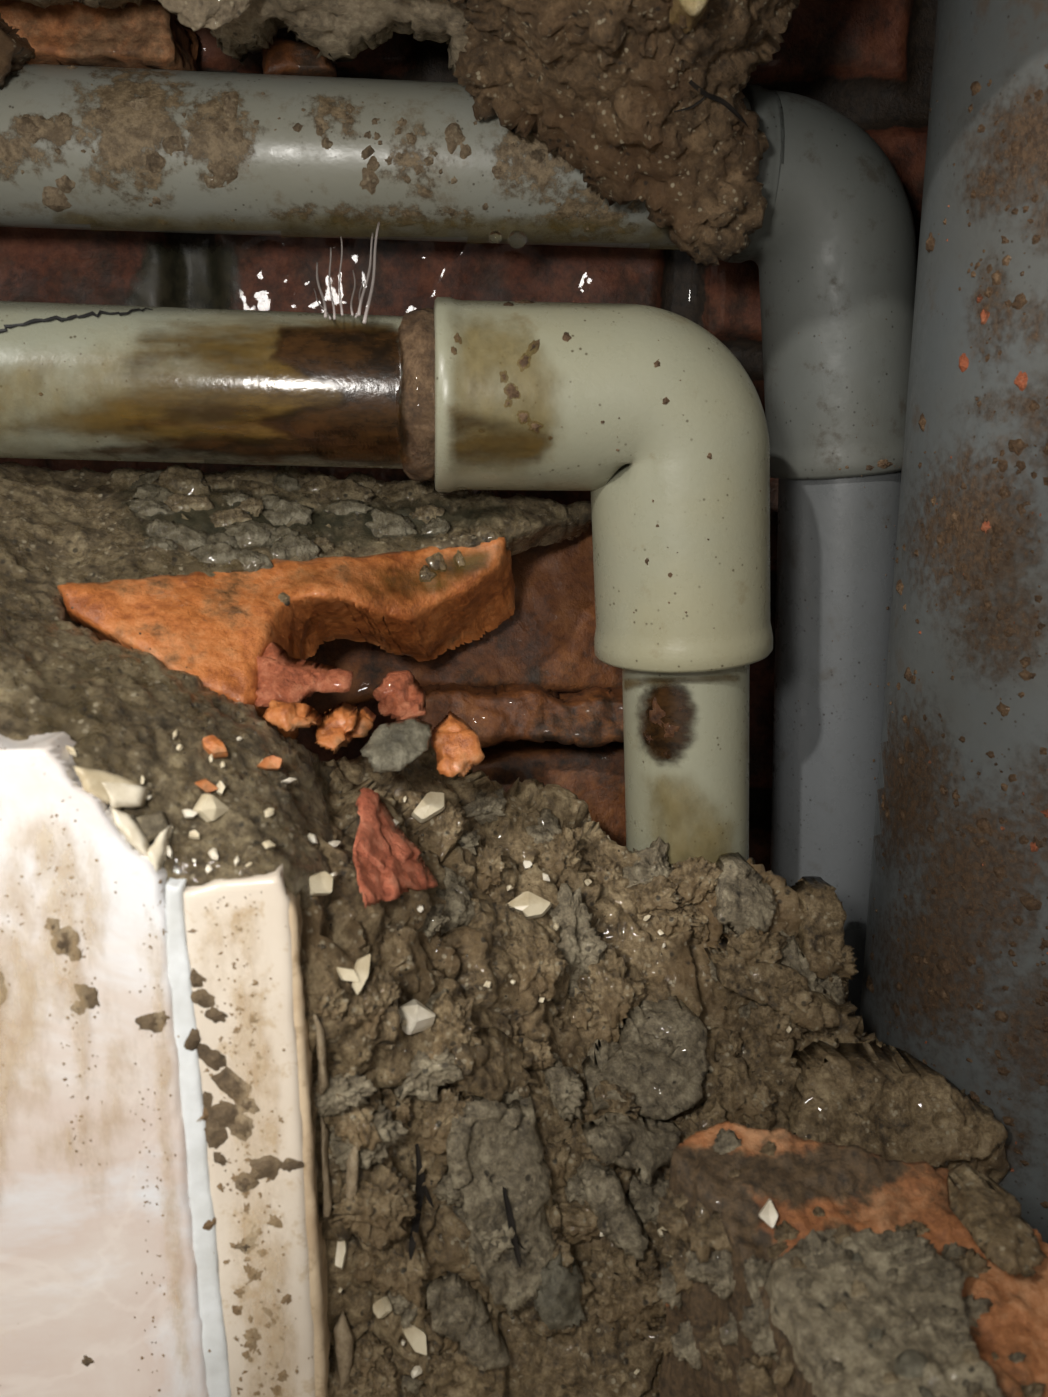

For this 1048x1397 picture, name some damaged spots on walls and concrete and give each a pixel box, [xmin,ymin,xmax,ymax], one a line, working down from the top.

flaking render [0,0,199,71]
rust [69,321,409,466]
spalling [57,537,515,739]
rust [624,675,734,762]
spalling [257,755,297,783]
spalling [66,735,253,874]
peeling [412,792,445,823]
peeling [309,871,338,896]
peeling [336,953,371,995]
peeling [399,999,435,1035]
peeling [758,1199,779,1229]
peeling [402,1324,427,1355]